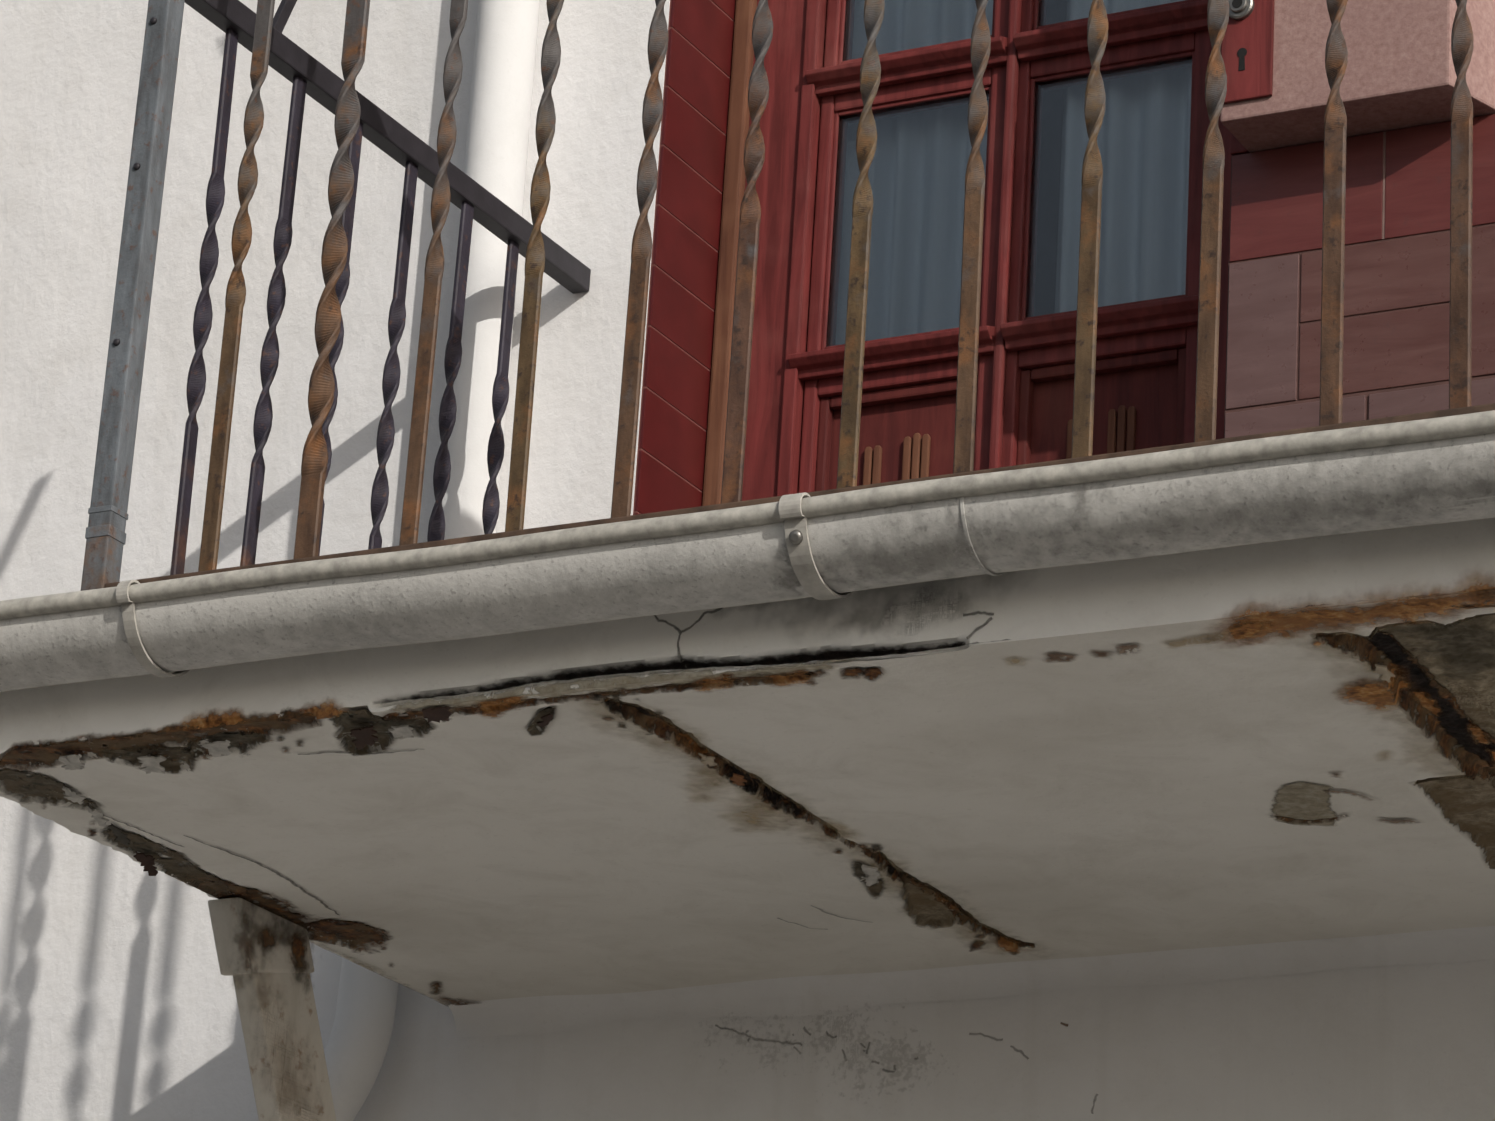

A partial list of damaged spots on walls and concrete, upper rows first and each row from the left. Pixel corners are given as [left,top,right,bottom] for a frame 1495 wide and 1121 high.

corrosion [1168,581,1495,647]
corrosion [1047,653,1075,662]
corrosion [1093,645,1138,657]
spalling [1371,613,1495,739]
spalling [0,670,723,979]
crack [374,608,1035,955]
peeling [1271,773,1372,826]
corrosion [235,904,308,985]
peeling [431,983,474,1005]